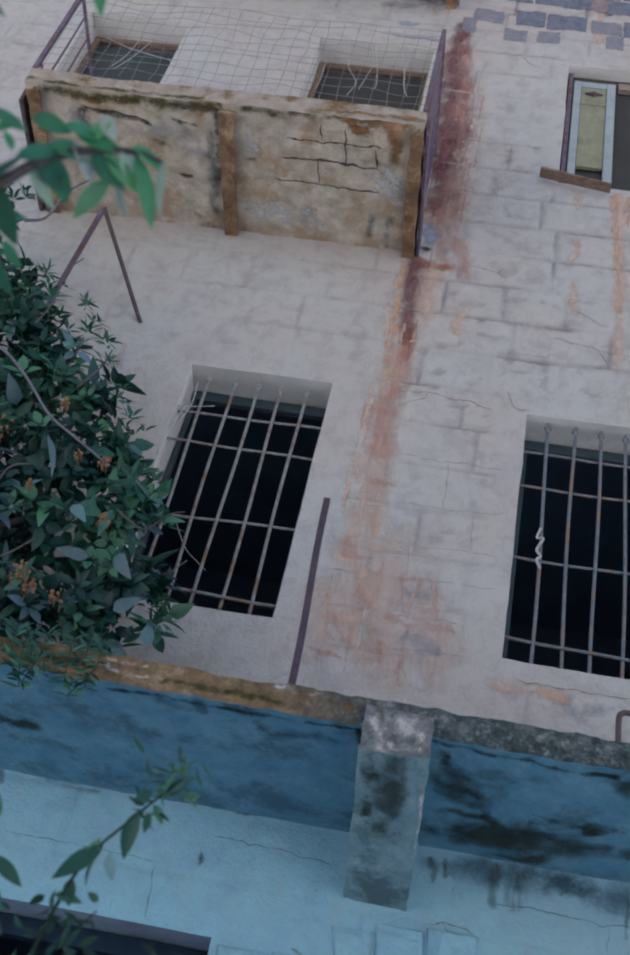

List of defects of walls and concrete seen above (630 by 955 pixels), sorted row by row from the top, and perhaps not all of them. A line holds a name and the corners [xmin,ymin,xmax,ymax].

flaking render [461,0,630,51]
crack [276,127,382,193]
rust [337,117,409,163]
rust [428,24,471,213]
rust [385,255,449,398]
leakage [361,762,404,829]
leakage [435,744,630,908]
crack [498,904,629,954]